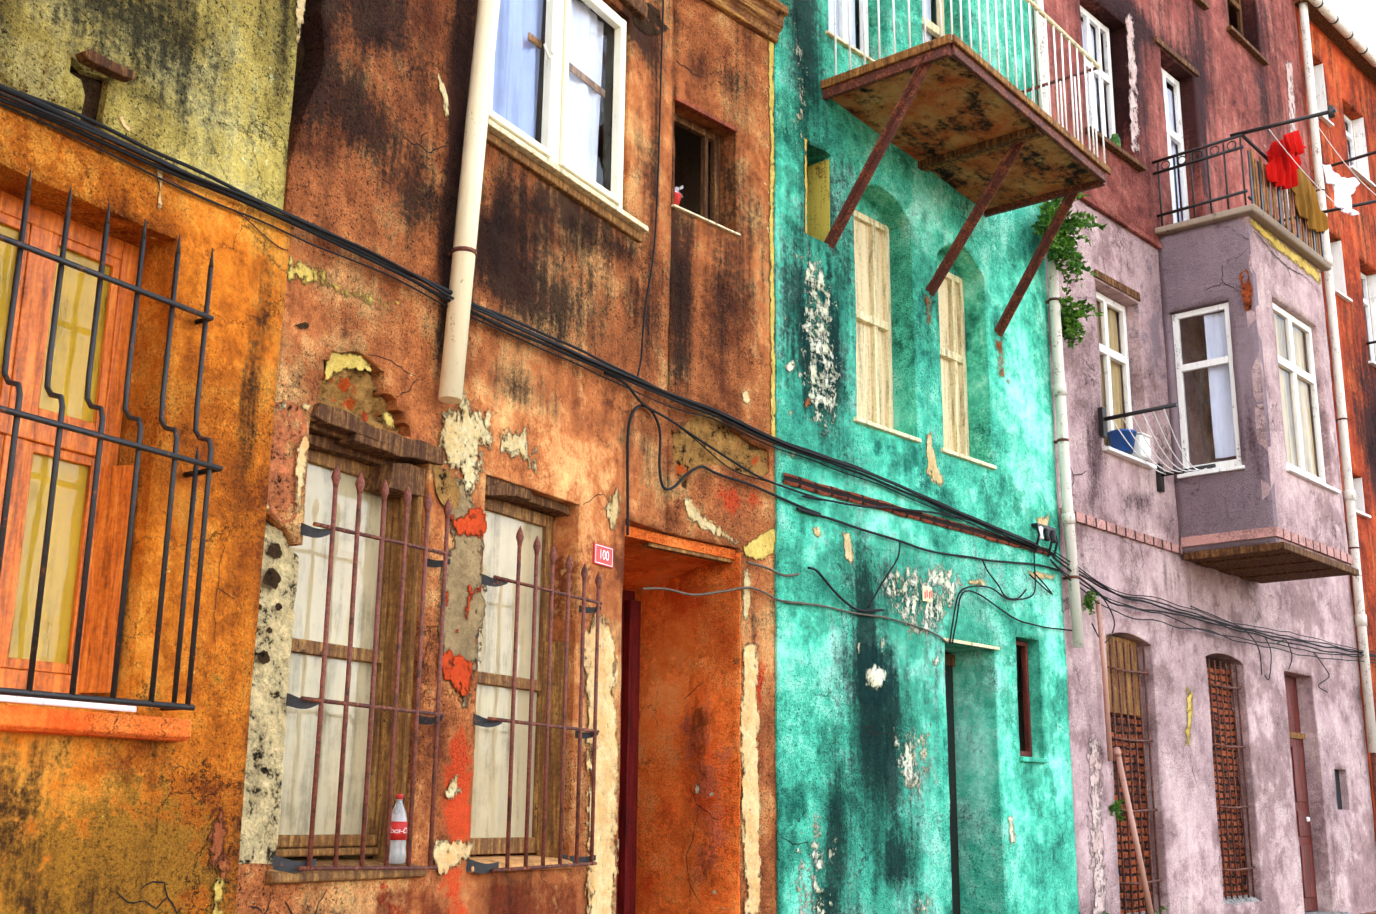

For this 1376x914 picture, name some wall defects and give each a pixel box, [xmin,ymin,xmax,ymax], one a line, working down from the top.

peeling [672,23,841,914]
spalling [207,352,400,914]
peeling [433,391,538,708]
peeling [842,531,855,565]
peeling [877,563,985,673]
peeling [1029,571,1055,580]
peeling [584,612,620,914]
damp [855,637,899,792]
peeling [894,724,937,804]
crack [116,881,178,914]